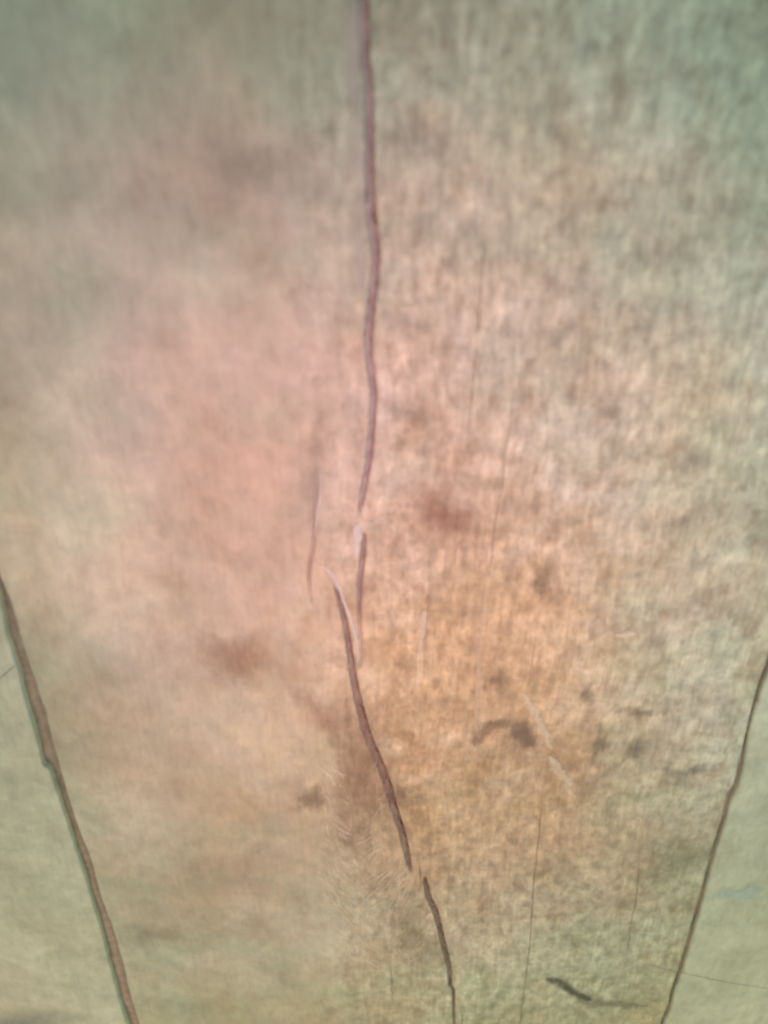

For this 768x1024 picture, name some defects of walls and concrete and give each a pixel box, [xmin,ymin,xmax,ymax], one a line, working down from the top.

crack [307,0,455,1023]
damp [547,979,591,1001]